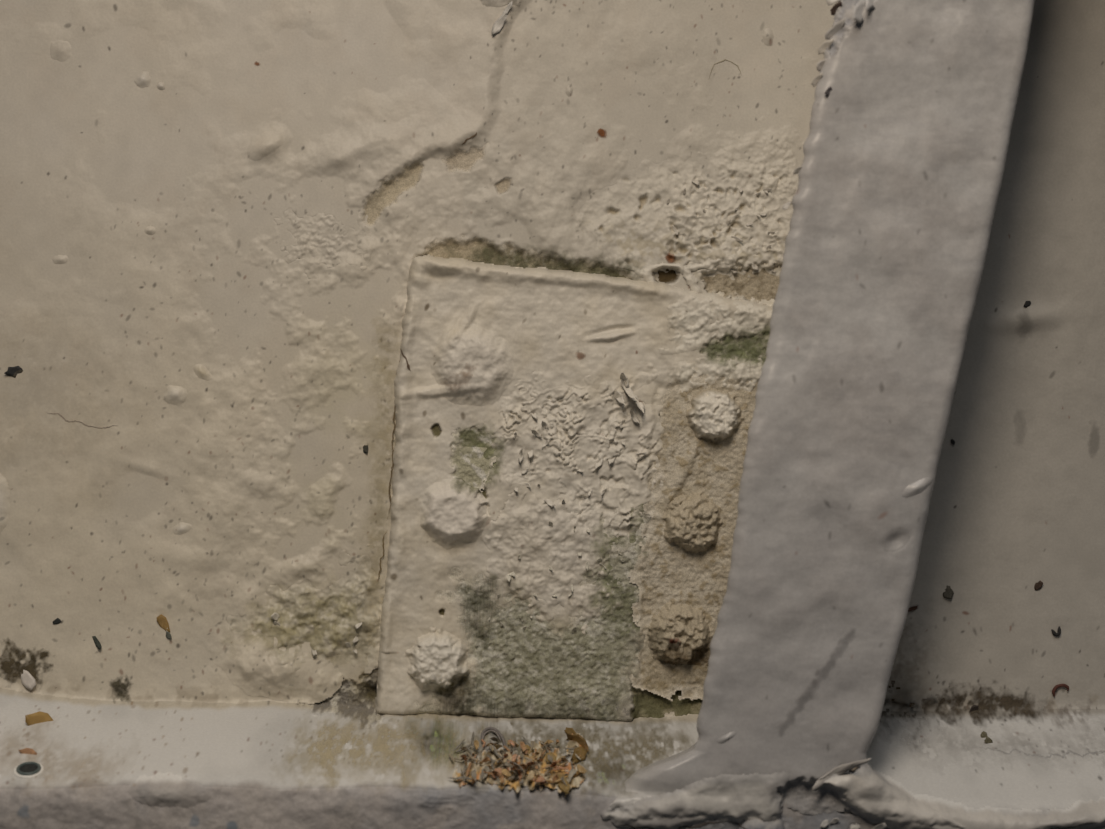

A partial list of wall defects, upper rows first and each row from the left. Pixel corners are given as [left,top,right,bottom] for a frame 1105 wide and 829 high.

peeling [811,0,875,96]
peeling [414,136,802,722]
peeling [601,758,1105,829]